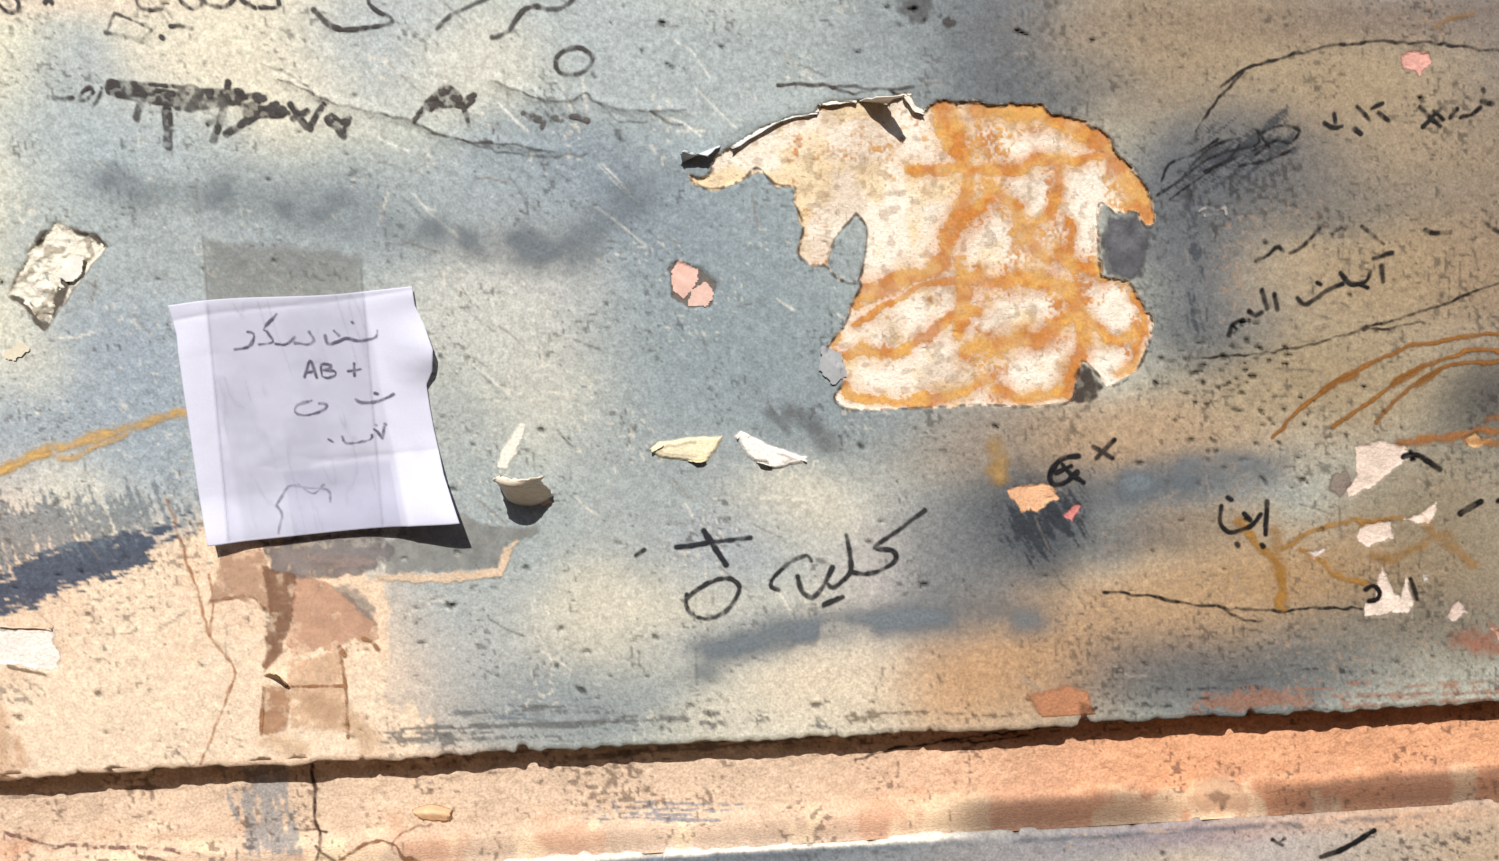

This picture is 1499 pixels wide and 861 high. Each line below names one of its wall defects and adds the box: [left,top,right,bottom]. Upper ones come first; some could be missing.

spalling [8,221,107,330]
peeling [668,259,716,308]
peeling [680,92,1156,411]
spalling [3,342,29,361]
peeling [1329,441,1409,497]
peeling [1007,483,1080,521]
crack [179,537,236,704]
crack [1103,591,1363,622]
peeling [1364,569,1428,616]
peeling [0,624,60,676]
crack [294,763,429,861]